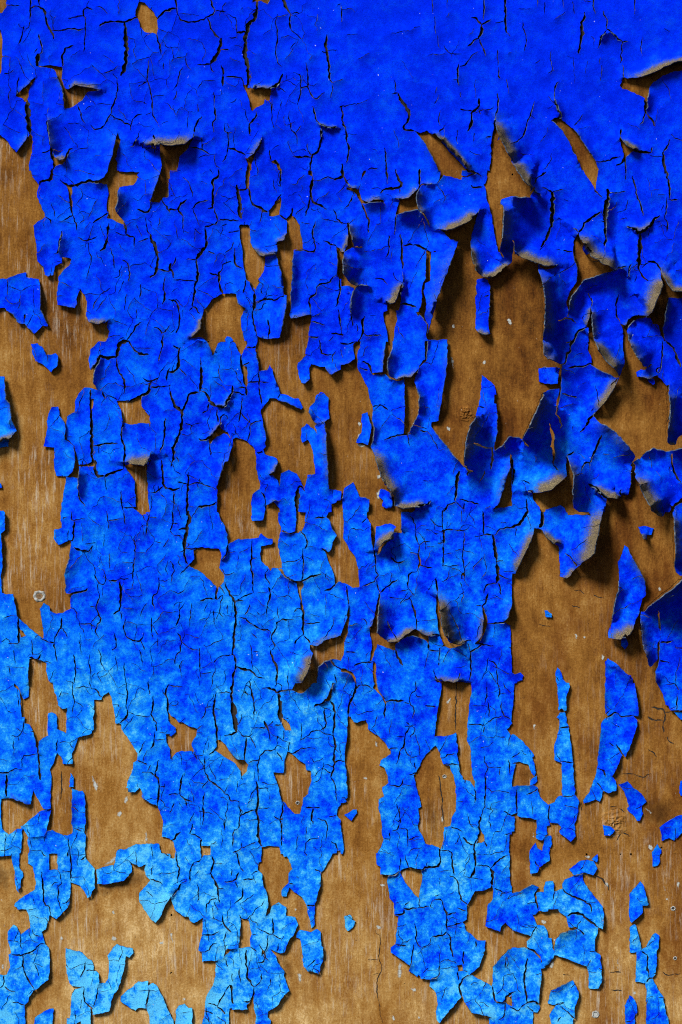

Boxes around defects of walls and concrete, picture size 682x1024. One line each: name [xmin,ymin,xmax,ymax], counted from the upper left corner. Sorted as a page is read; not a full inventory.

peeling [91,128,201,224]
crack [395,0,681,498]
peeling [0,134,110,638]
peeling [117,396,151,425]
peeling [118,446,160,515]
crack [0,0,544,1024]
peeling [183,105,682,1024]
crack [620,607,680,744]
crack [548,697,632,831]
peeling [0,659,251,1024]
crack [553,862,609,939]
crack [633,938,679,981]